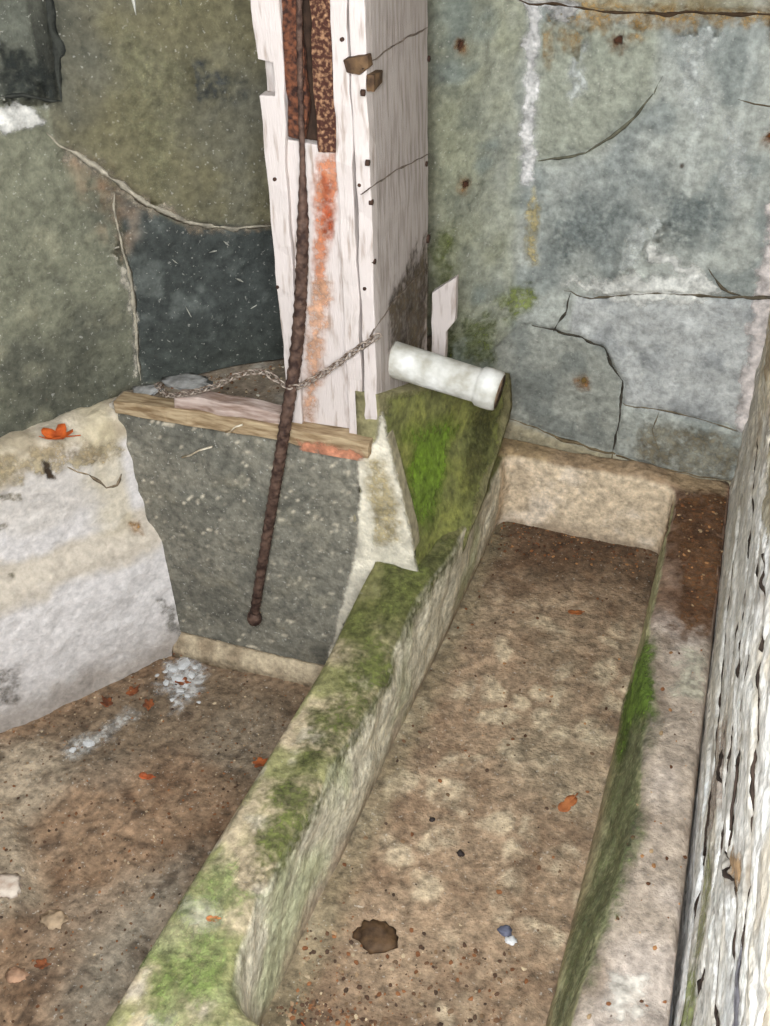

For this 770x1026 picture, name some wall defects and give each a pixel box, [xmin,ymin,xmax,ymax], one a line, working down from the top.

crack [538,76,663,161]
crack [519,0,770,17]
corrosion [303,156,338,420]
crack [510,268,770,1026]